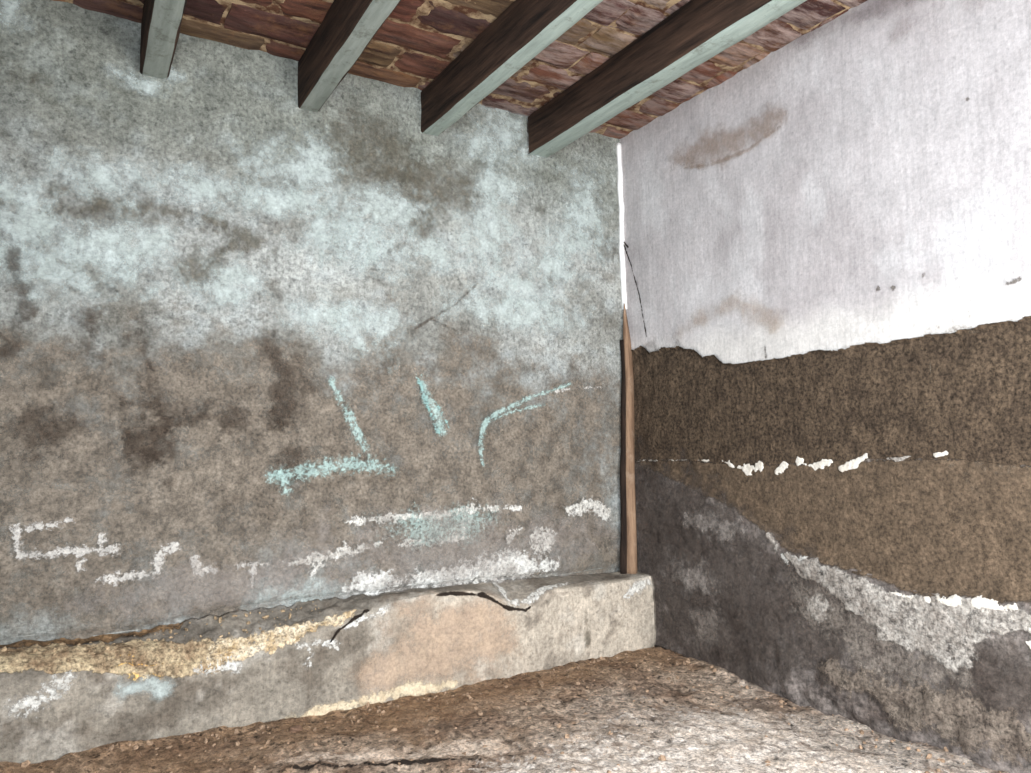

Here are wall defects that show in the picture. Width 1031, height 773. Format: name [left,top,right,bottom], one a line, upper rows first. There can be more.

leakage [0,149,180,298]
leakage [176,108,601,330]
leakage [0,296,621,719]
crack [330,609,369,643]
crack [437,591,531,612]
leakage [623,461,844,685]
flaking render [631,316,1031,766]
leakage [954,643,1031,719]